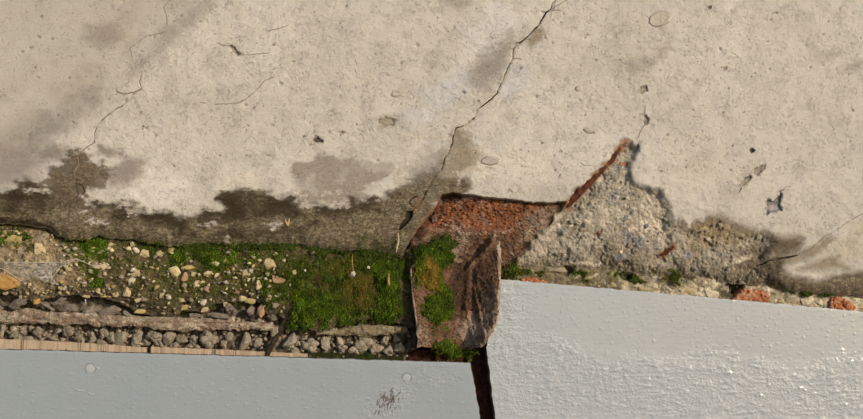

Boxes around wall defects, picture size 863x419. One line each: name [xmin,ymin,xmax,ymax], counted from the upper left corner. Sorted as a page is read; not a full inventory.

crack [44,78,142,222]
water stain [0,131,478,258]
crack [397,0,567,230]
spalling [509,143,784,289]
water stain [708,219,863,297]